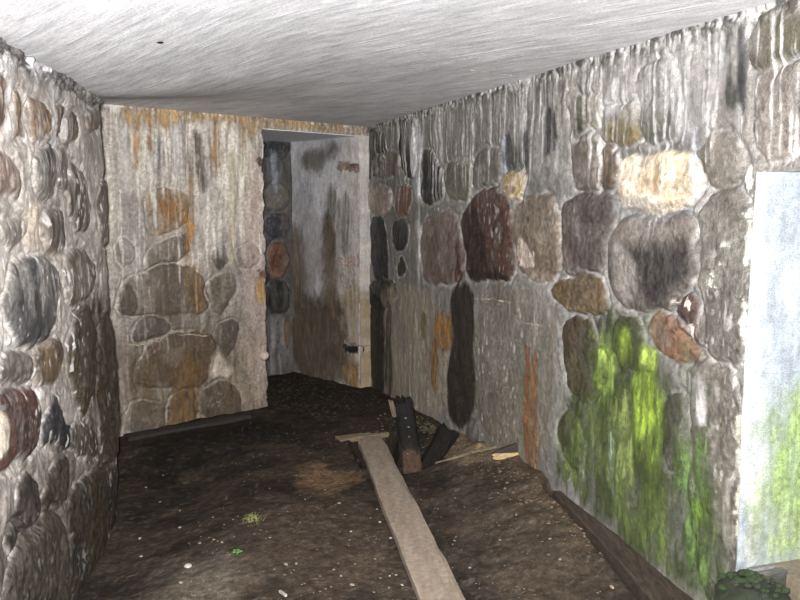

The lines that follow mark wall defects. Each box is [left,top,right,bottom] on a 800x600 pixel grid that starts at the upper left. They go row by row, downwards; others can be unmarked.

rust [125,107,325,167]
leakage [302,143,336,171]
leakage [292,189,349,381]
rust [422,312,452,394]
rust [524,349,539,469]
leakage [695,374,706,426]